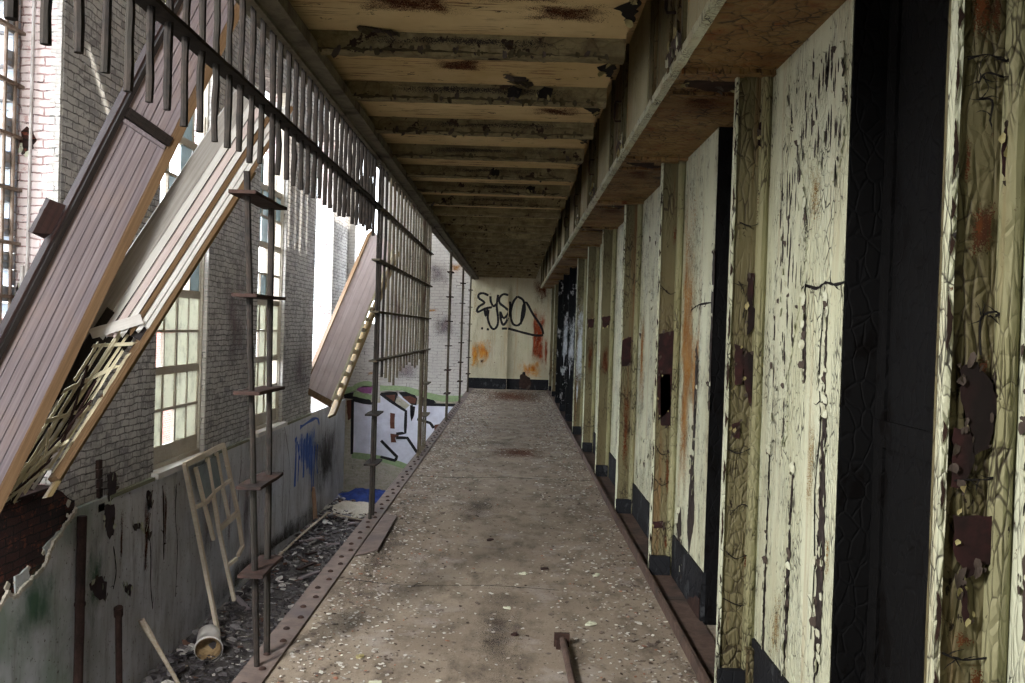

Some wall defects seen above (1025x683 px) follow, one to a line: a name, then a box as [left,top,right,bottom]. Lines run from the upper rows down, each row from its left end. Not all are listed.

corrosion [352,0,611,23]
peeling [353,74,601,117]
crack [963,54,1009,137]
peeling [998,120,1008,186]
corrosion [518,303,548,377]
peeling [621,248,715,560]
corrosion [665,181,699,504]
peeling [725,40,848,683]
crack [969,300,1021,355]
crack [801,271,844,639]
flaking render [0,490,78,612]
peeling [1017,555,1025,641]